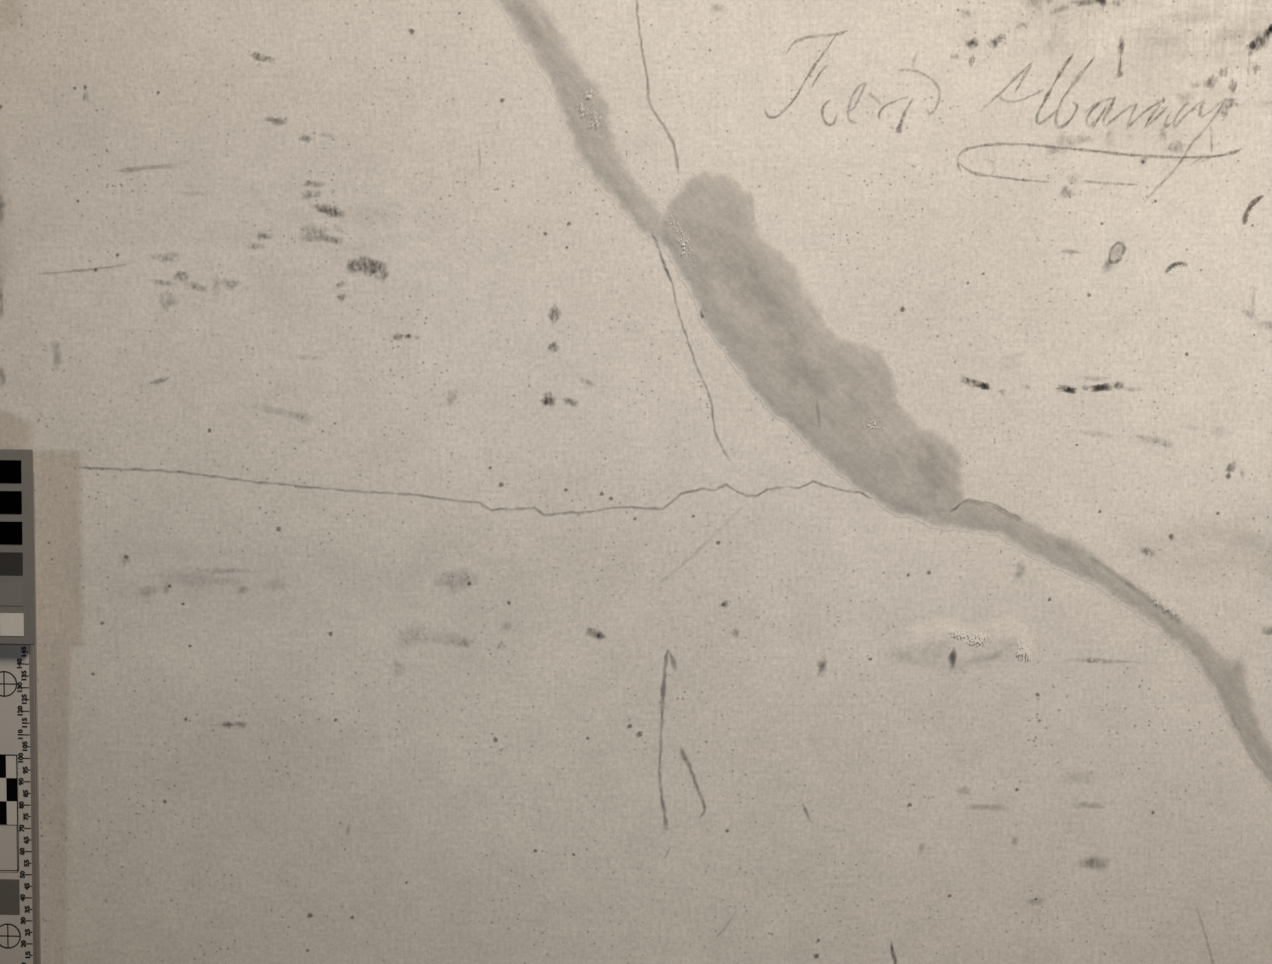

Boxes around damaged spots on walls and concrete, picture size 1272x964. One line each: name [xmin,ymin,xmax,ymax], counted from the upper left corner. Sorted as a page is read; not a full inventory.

crack [494,0,1272,791]